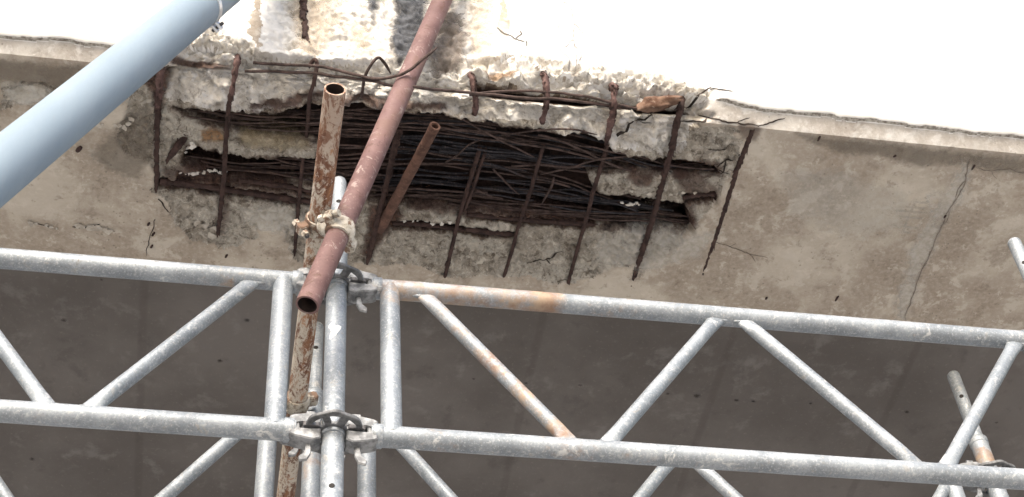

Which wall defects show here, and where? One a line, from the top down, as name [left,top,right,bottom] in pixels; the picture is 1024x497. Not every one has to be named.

spalling [0,80,57,110]
rust [146,57,229,102]
rust [165,129,312,199]
spalling [95,0,406,250]
rust [251,91,323,111]
rust [344,94,386,109]
rust [406,101,445,111]
rust [363,177,580,256]
spalling [347,0,744,285]
rust [672,159,718,225]
crack [681,86,786,174]
crack [905,161,1022,320]